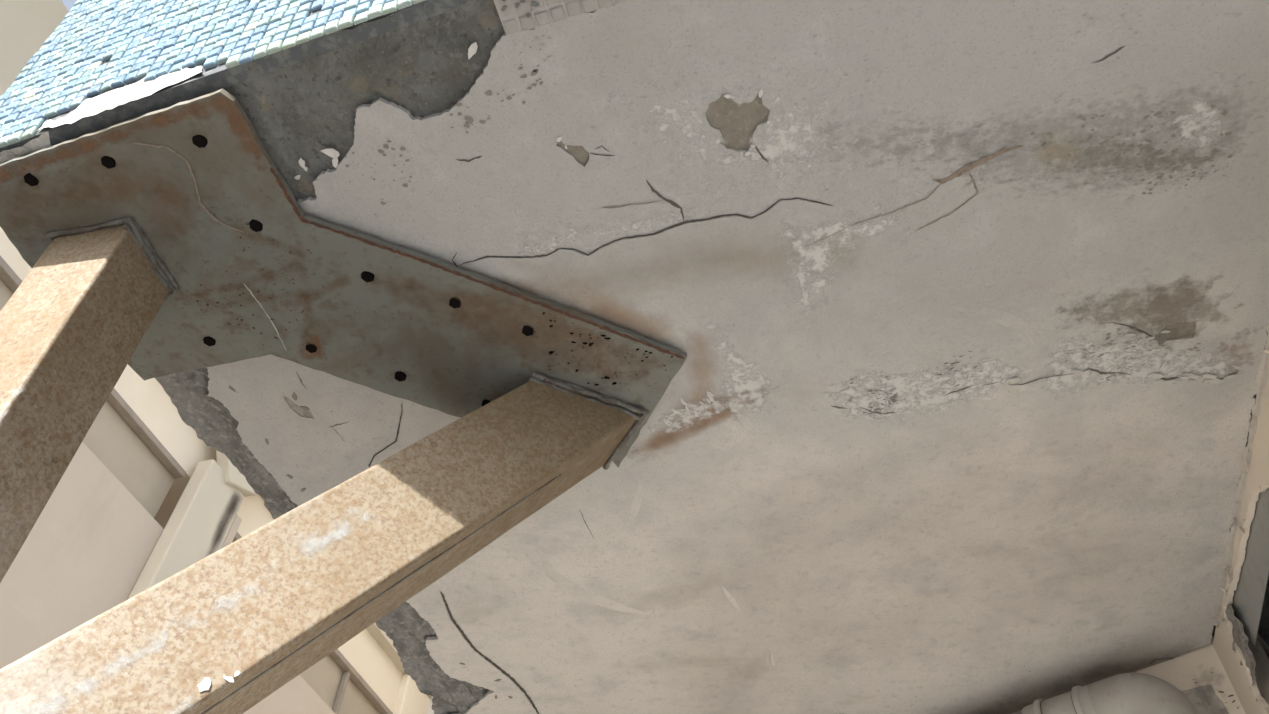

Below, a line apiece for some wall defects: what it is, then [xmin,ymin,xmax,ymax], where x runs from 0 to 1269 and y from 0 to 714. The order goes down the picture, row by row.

spalling [187,0,544,207]
corrosion [270,168,684,359]
spalling [705,88,770,163]
crack [452,145,1024,267]
water stain [639,46,863,179]
water stain [871,103,1234,195]
spalling [1154,321,1196,344]
spalling [155,367,306,519]
flaking render [1212,321,1269,714]
spalling [375,602,513,714]
crack [440,592,539,714]